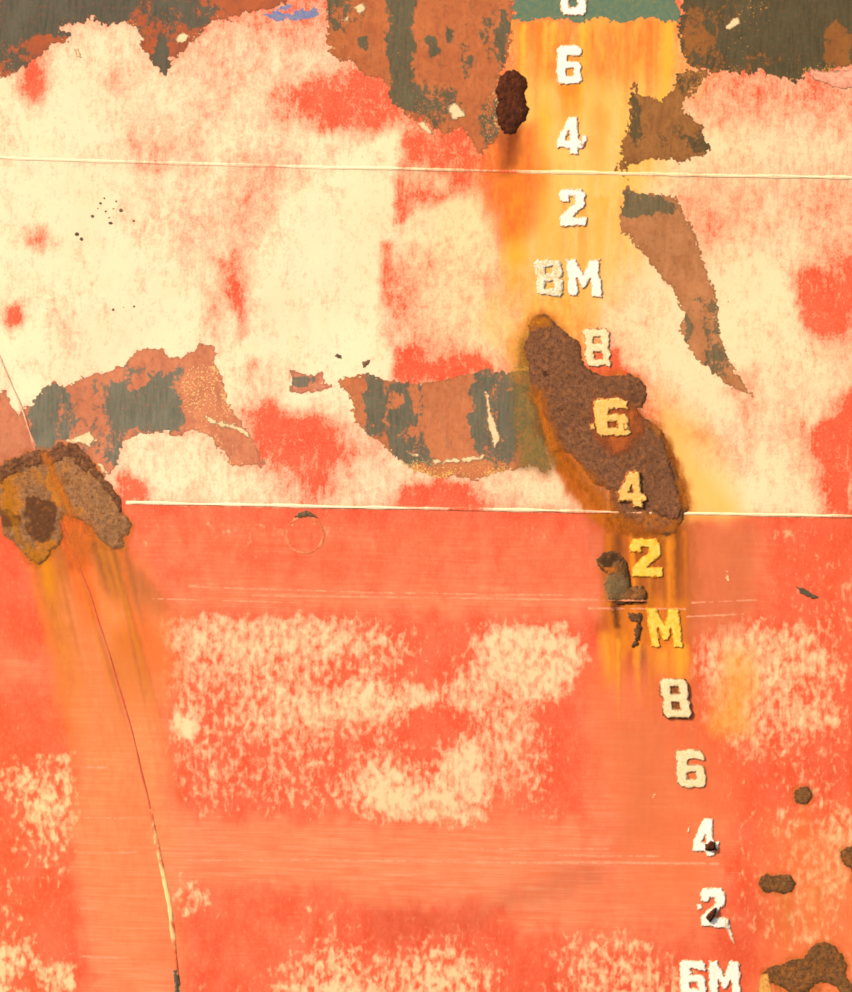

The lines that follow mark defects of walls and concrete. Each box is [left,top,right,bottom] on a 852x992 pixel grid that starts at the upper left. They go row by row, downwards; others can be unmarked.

peeling [0,0,287,79]
peeling [325,0,514,155]
peeling [614,0,852,398]
peeling [0,343,266,478]
peeling [289,360,551,482]
corrosion [466,0,852,992]
corrosion [0,442,198,992]